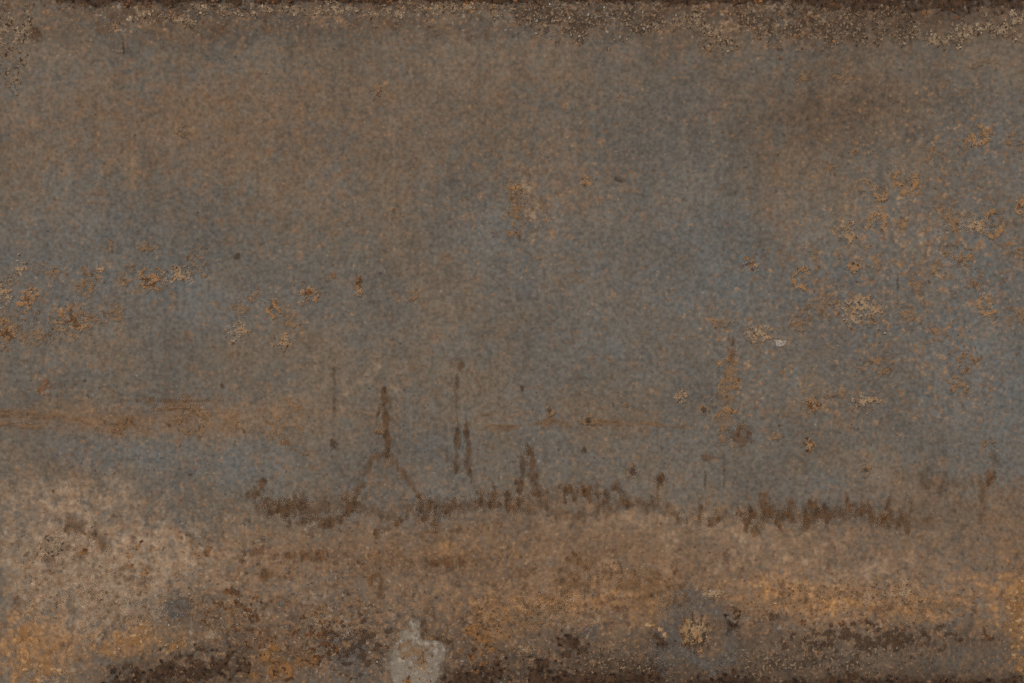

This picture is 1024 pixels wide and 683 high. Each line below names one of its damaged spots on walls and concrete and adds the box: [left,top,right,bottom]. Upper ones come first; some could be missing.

rust [833,170,919,250]
rust [0,253,126,352]
rust [117,244,207,292]
rust [790,248,948,341]
rust [910,208,1024,322]
rust [101,575,393,683]
rust [442,554,1024,683]